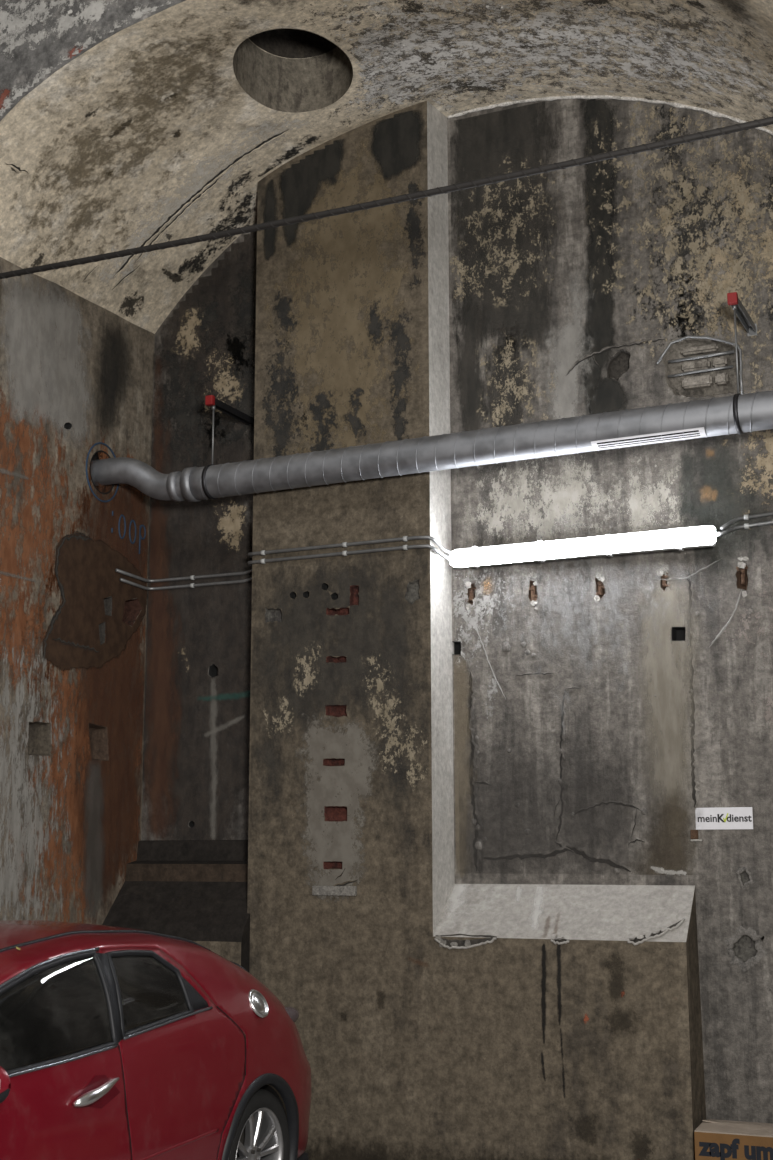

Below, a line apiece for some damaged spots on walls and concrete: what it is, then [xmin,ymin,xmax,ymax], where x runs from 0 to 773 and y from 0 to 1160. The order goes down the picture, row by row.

peeling [0,0,171,116]
crack [5,163,28,174]
crack [83,130,289,290]
leakage [99,119,344,283]
leakage [372,110,426,291]
peeling [300,0,773,398]
leakage [450,99,627,431]
peeling [476,335,558,427]
rust [0,388,149,923]
peeling [362,654,427,791]
crack [467,670,645,872]
leakage [541,944,565,1098]